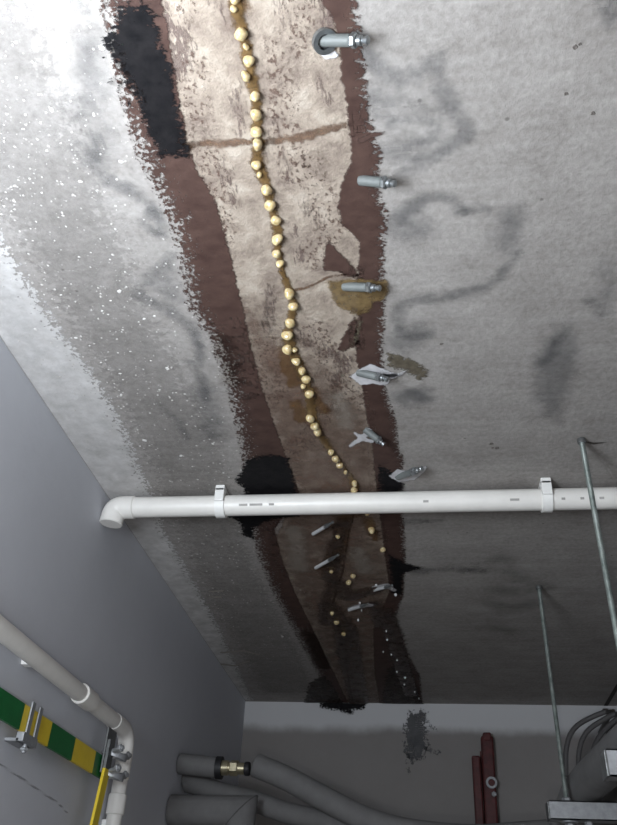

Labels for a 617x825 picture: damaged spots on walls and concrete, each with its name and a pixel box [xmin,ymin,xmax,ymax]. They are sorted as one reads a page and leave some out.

corrosion [177,123,347,149]
peeling [0,76,167,500]
spalling [161,0,377,494]
crack [228,0,359,493]
corrosion [328,279,389,351]
corrosion [386,352,428,380]
peeling [124,517,261,701]
spalling [276,514,390,703]
crack [321,514,386,672]
damp [317,519,419,704]
damp [403,709,441,772]